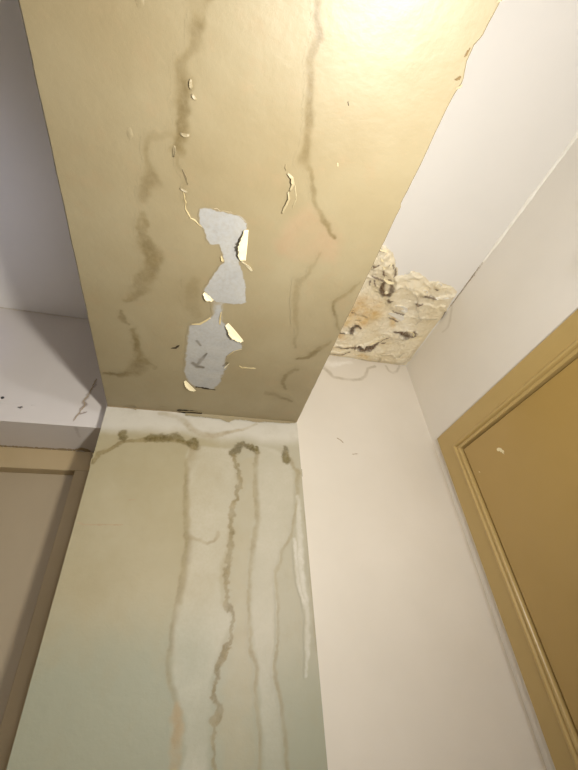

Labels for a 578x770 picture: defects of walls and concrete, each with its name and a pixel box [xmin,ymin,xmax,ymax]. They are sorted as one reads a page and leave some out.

water stain [100,0,224,380]
peeling [172,192,256,392]
peeling [329,245,457,365]
water stain [90,411,317,770]